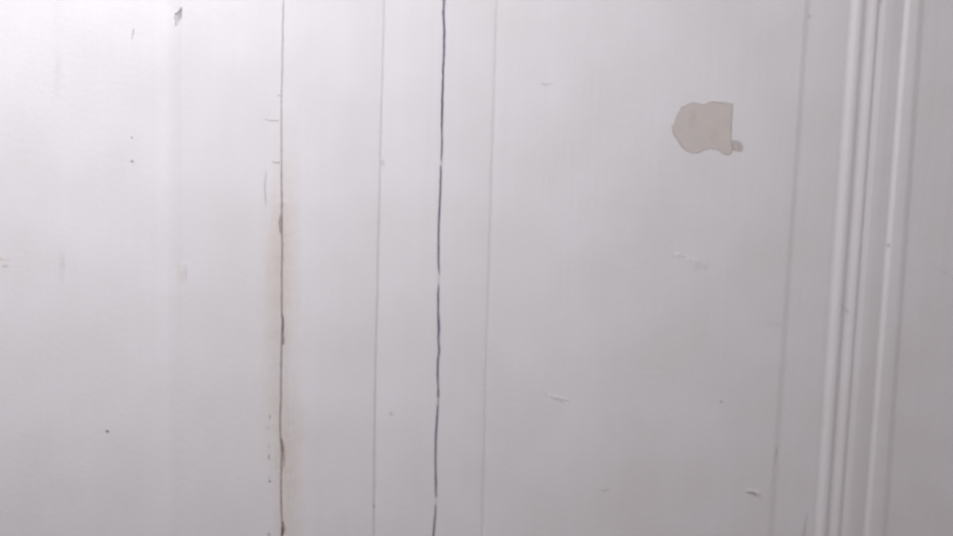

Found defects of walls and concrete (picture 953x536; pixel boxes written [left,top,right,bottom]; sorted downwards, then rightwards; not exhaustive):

crack [433,0,445,536]
peeling [672,102,733,155]